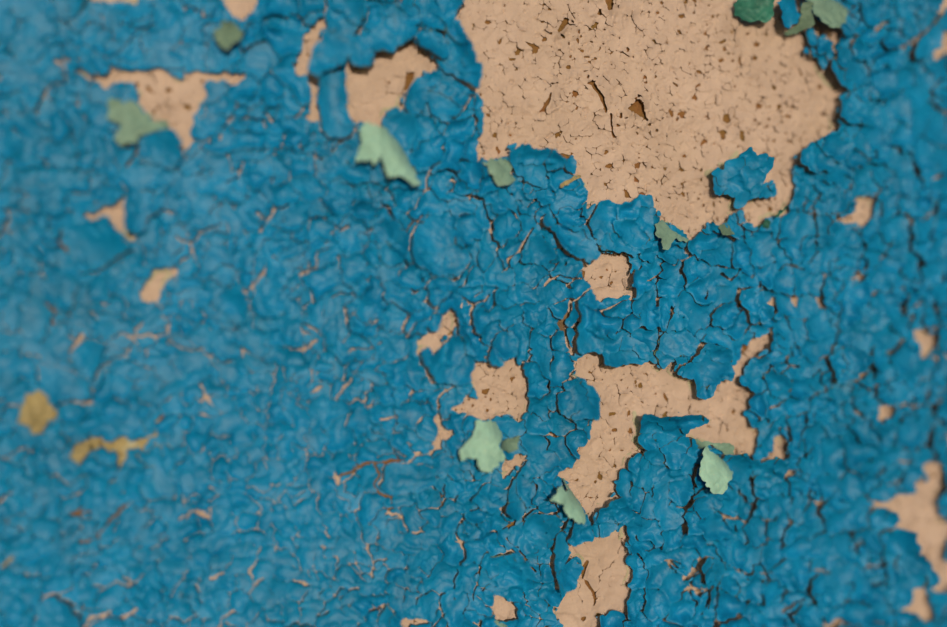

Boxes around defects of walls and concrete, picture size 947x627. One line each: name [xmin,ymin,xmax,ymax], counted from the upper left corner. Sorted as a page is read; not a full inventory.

peeling [53,0,297,178]
crack [588,80,616,138]
peeling [59,175,200,325]
crack [59,323,233,407]
peeling [211,283,289,324]
crack [311,376,439,420]
peeling [285,0,902,627]
peeling [890,308,947,381]
crack [331,454,424,534]
peeling [827,346,947,627]
crack [60,577,138,627]
crack [581,560,597,605]